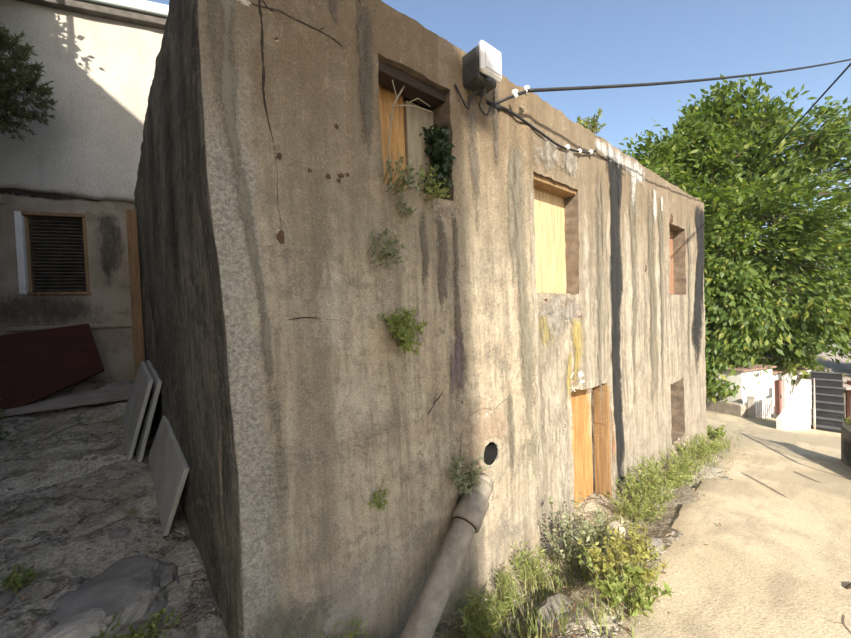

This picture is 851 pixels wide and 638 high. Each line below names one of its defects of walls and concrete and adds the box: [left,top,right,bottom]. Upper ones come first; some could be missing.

damp [97,214,125,269]
damp [207,0,273,376]
crack [251,0,343,223]
damp [356,4,374,153]
damp [420,212,466,396]
damp [467,89,480,228]
damp [507,146,540,475]
peeling [538,297,583,336]
spalling [571,371,585,392]
damp [596,152,639,487]
damp [648,203,665,396]
damp [687,206,705,382]